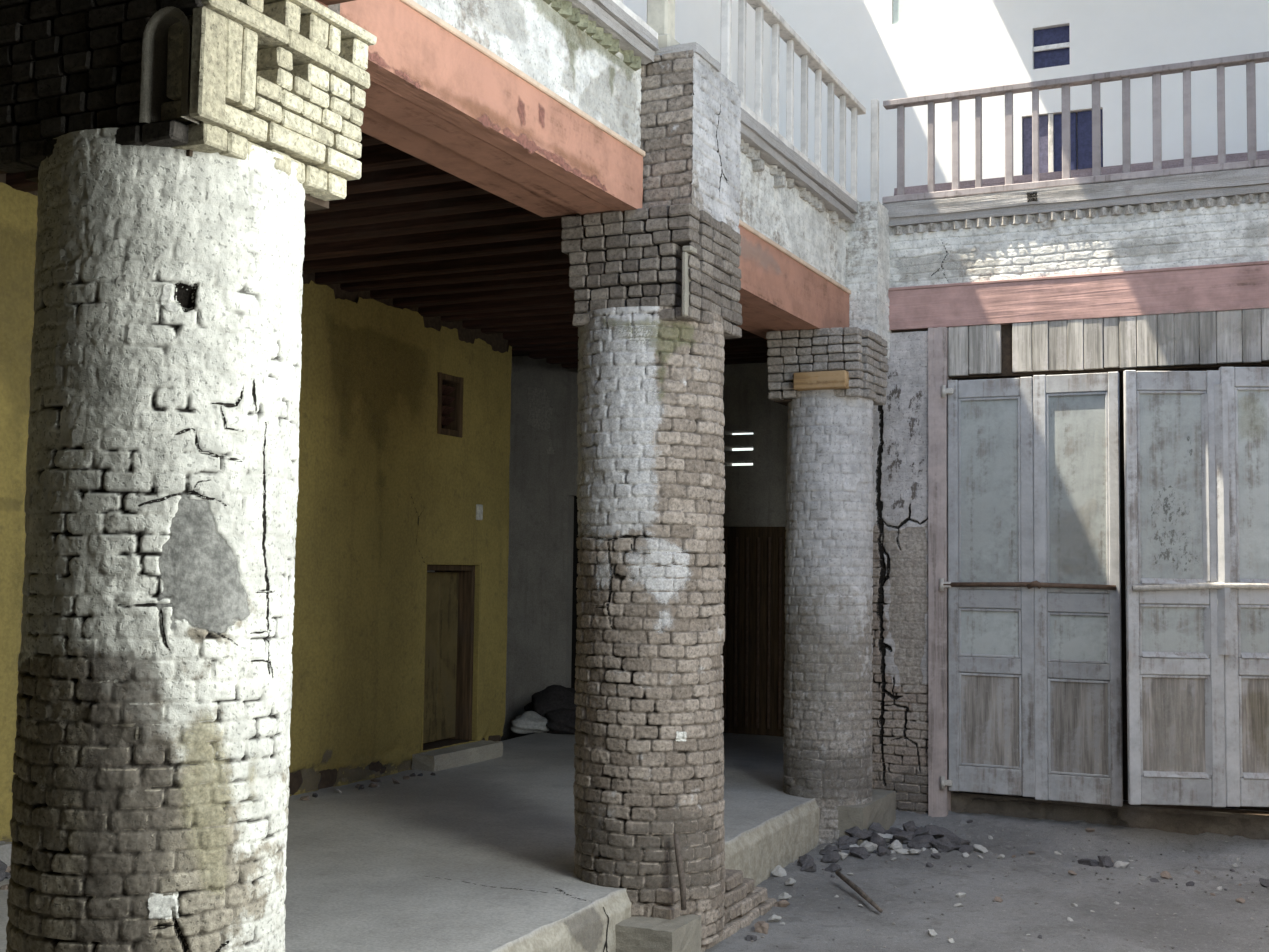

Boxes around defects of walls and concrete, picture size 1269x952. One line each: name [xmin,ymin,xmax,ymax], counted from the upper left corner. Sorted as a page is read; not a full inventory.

spalling [160,282,198,312]
crack [118,603,172,651]
spalling [156,494,250,633]
crack [138,379,273,678]
crack [875,405,928,786]